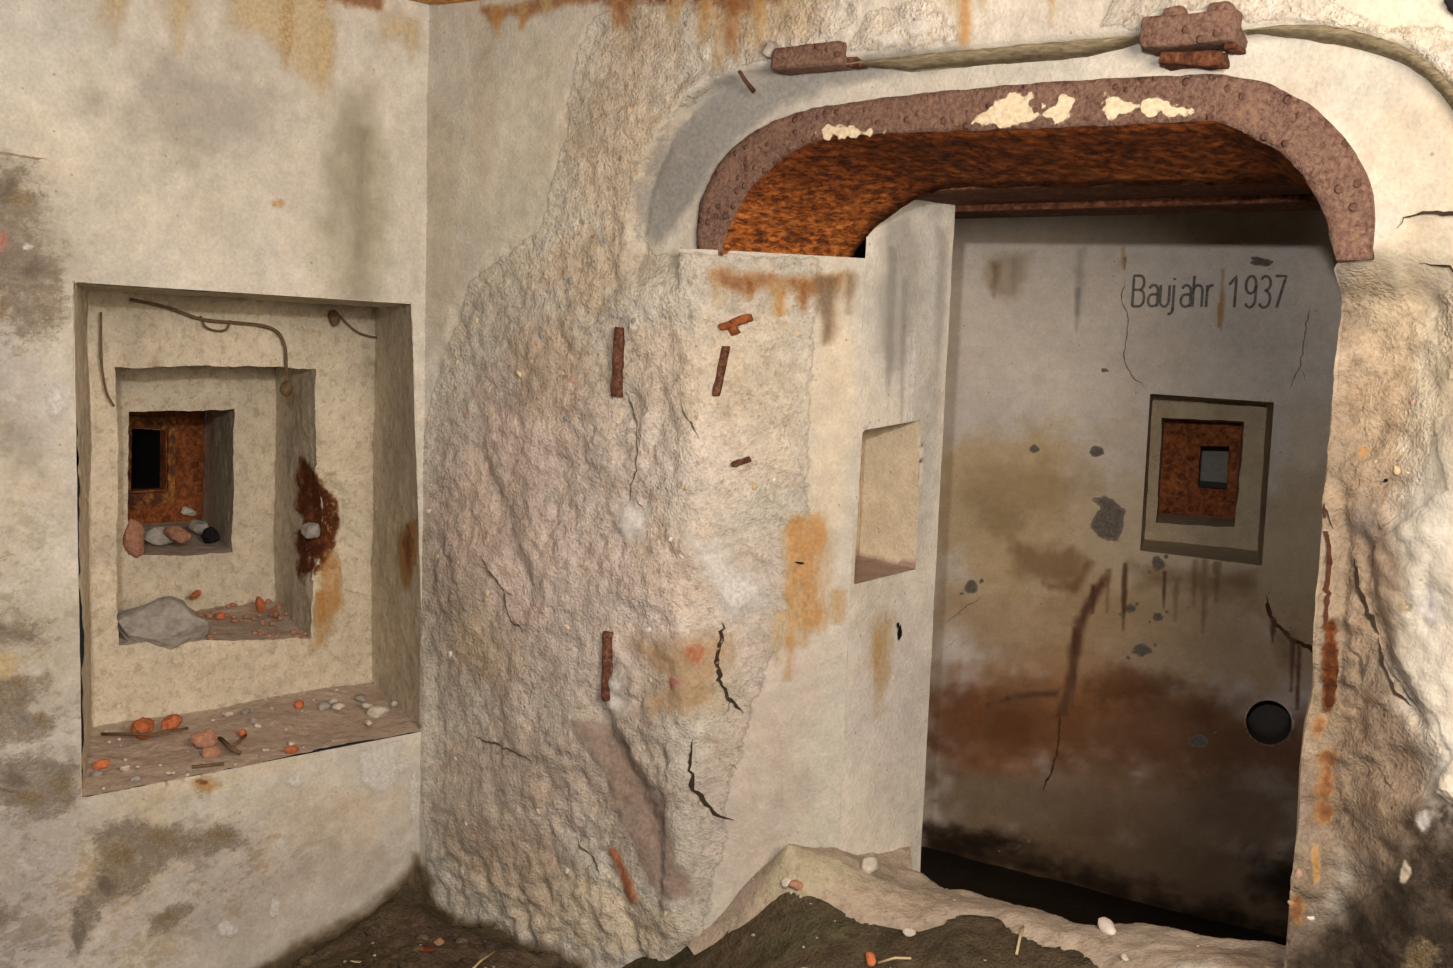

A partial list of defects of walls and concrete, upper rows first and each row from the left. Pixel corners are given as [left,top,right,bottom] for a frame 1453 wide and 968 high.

corrosion [481,0,779,58]
spalling [1101,0,1453,82]
crack [1396,211,1453,229]
crack [1419,263,1453,272]
spalling [419,0,960,968]
crack [1322,504,1426,720]
crack [713,622,743,713]
crack [688,739,733,820]
leakage [922,825,1293,938]
leakage [1287,803,1453,968]